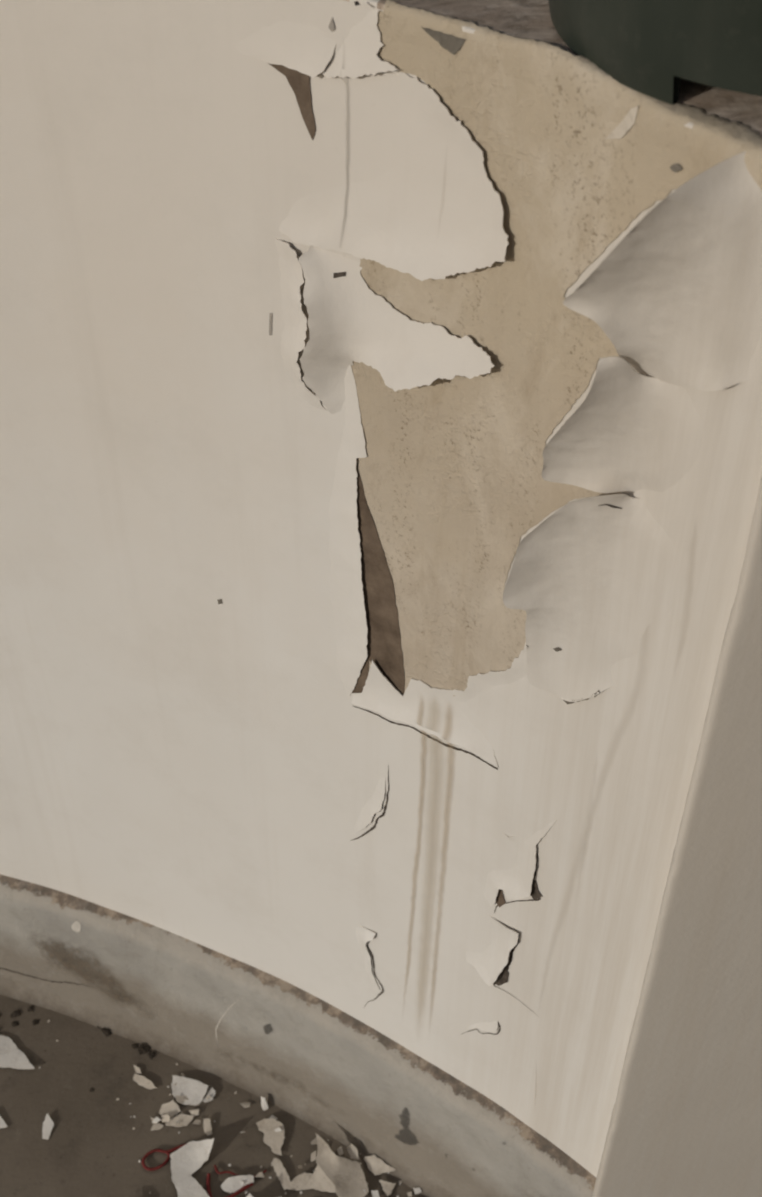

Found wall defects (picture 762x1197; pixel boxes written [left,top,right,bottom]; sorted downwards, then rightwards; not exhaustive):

peeling [274,0,762,702]
crack [356,925,384,1006]